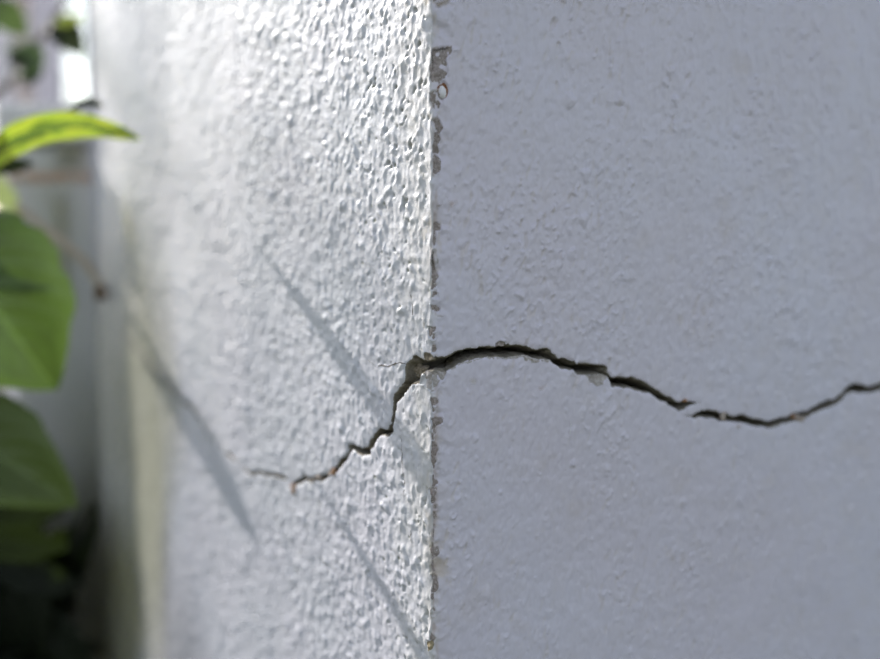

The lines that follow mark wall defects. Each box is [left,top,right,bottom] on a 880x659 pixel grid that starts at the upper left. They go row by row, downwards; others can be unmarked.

crack [117,328,880,495]